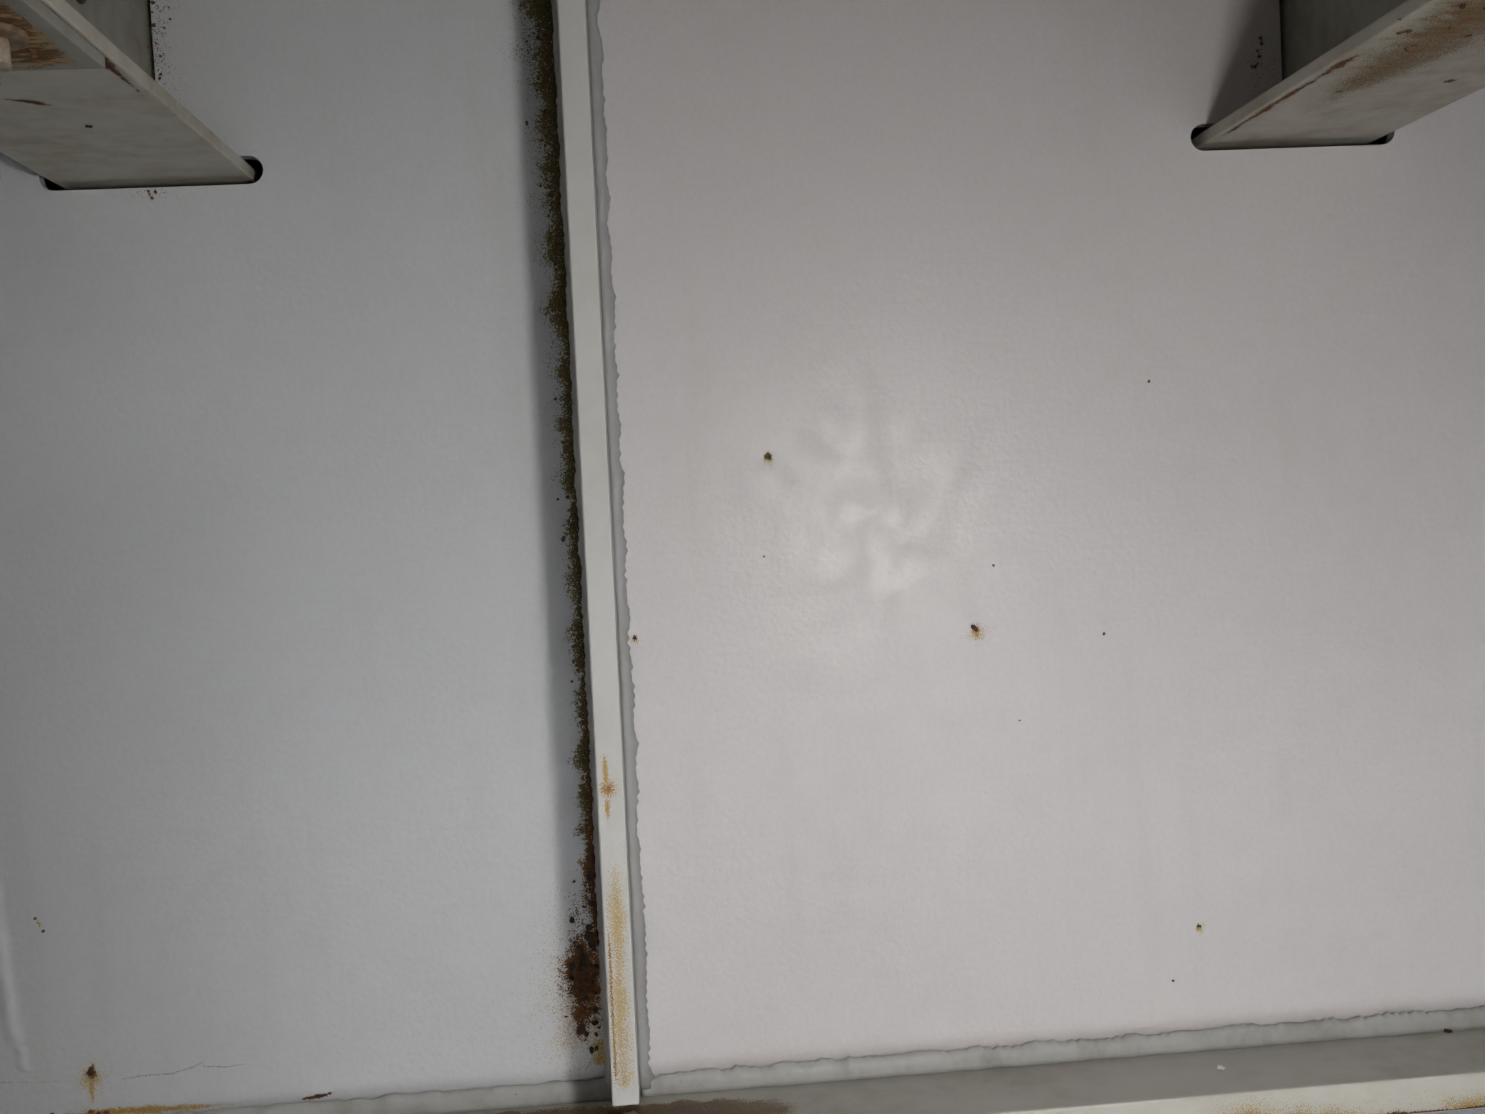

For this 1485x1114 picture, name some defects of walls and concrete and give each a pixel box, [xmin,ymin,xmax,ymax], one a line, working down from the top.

corrosion [0,1,79,70]
corrosion [1226,0,1485,134]
leakage [501,0,593,861]
corrosion [964,618,987,642]
corrosion [526,754,636,1093]
corrosion [50,1058,246,1114]
corrosion [1204,1090,1485,1114]